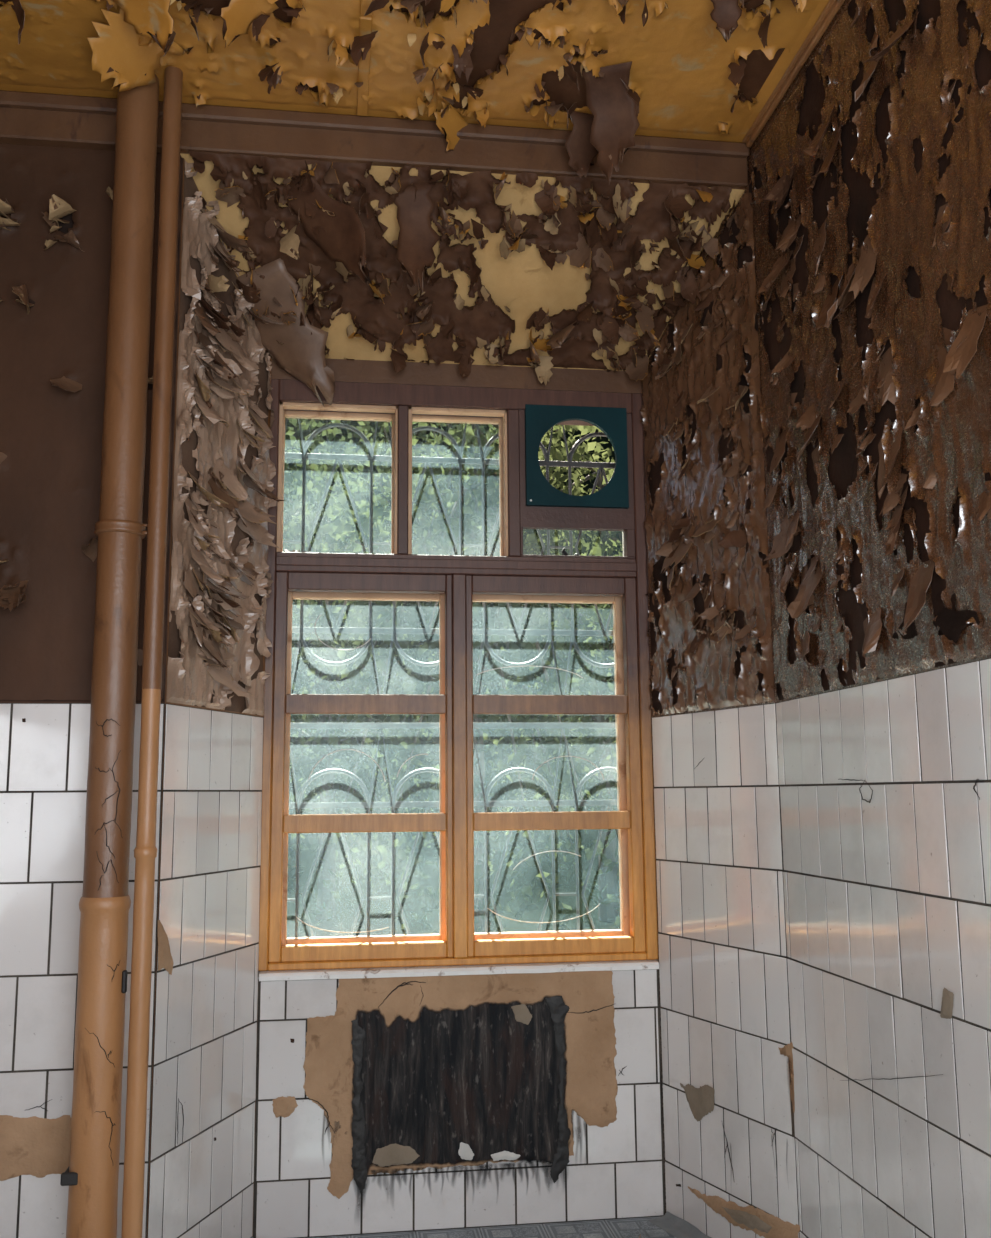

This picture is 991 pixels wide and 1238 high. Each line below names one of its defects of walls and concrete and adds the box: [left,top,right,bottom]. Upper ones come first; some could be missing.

peeling [0,0,991,716]
peeling [158,920,174,975]
peeling [272,971,625,1199]
peeling [680,1083,715,1122]
peeling [0,1115,71,1181]
peeling [676,1184,800,1238]